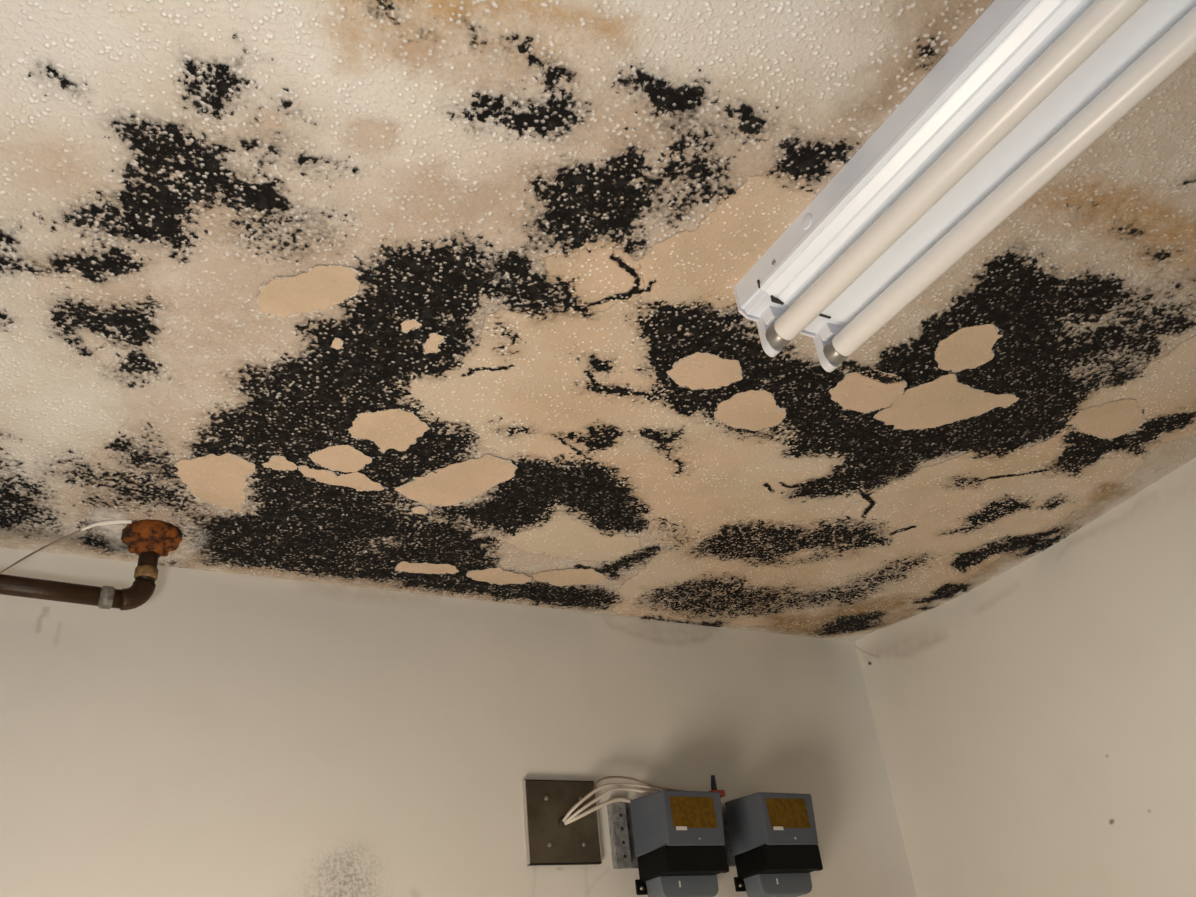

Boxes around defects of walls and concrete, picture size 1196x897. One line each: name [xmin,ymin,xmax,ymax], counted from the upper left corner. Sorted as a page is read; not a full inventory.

leakage [0,0,1196,636]
peeling [174,164,1196,635]